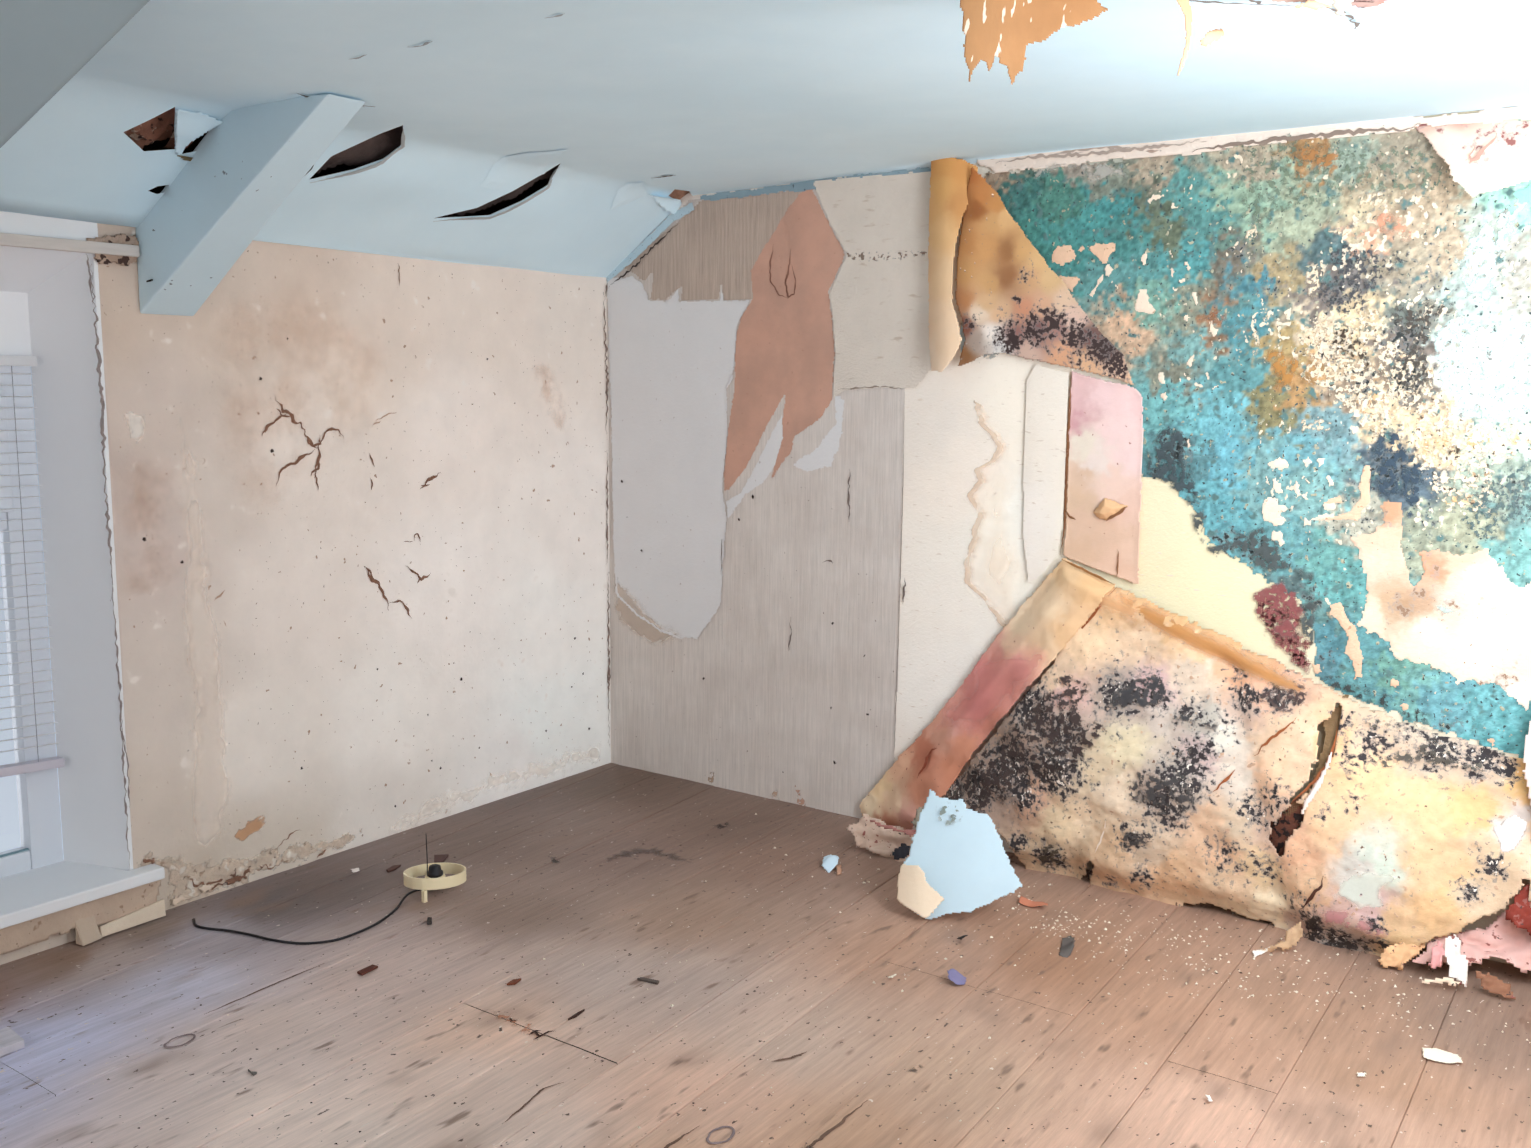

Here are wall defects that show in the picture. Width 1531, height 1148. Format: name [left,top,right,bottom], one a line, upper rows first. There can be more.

peeling [960,0,1108,85]
peeling [1351,0,1389,8]
flaking render [723,189,844,491]
crack [262,399,397,490]
peeling [928,105,1531,759]
crack [366,533,431,617]
mould [1110,675,1166,708]
mould [946,675,1107,812]
mould [1128,747,1194,814]
spalling [142,834,354,906]
mould [1119,833,1153,850]
mould [1305,873,1392,952]